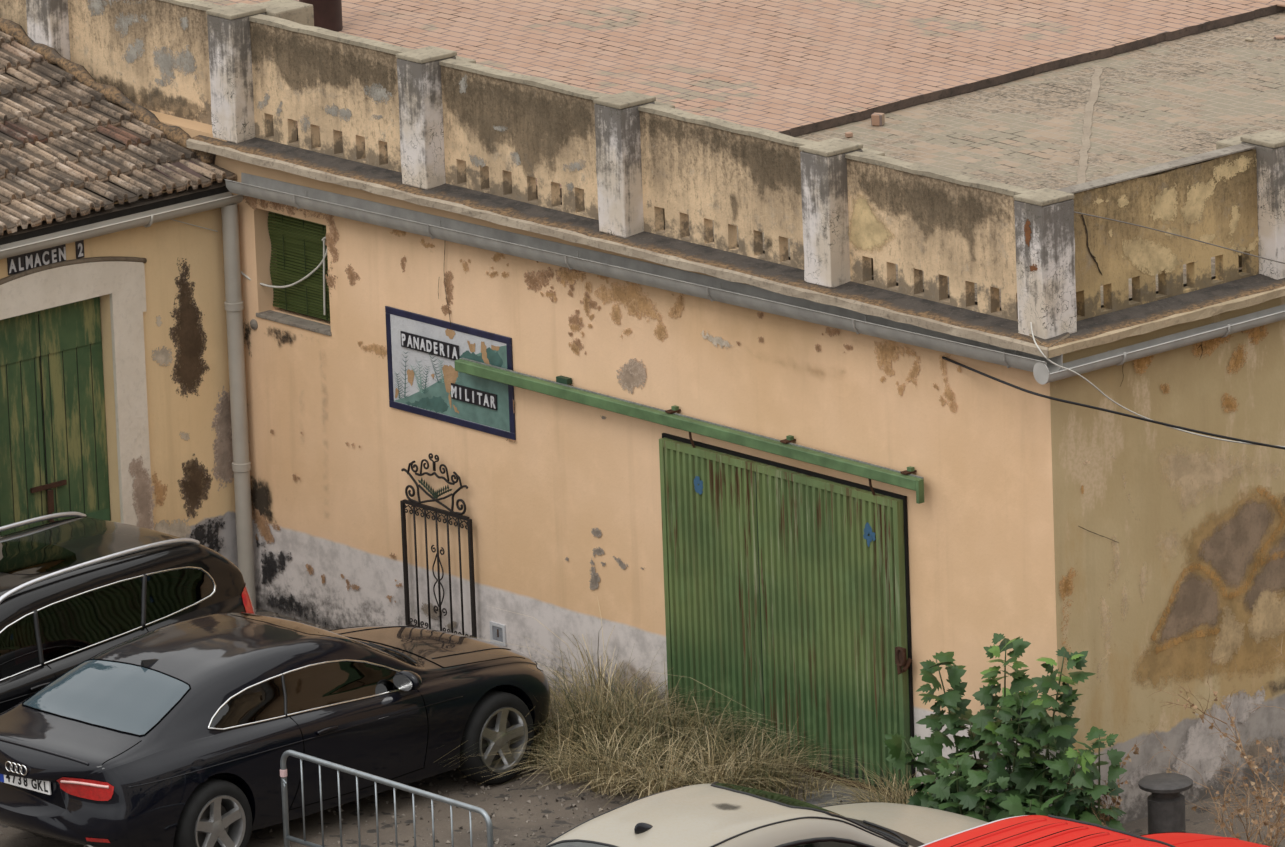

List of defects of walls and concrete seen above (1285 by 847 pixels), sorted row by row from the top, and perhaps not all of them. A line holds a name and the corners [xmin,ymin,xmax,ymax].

peeling [441,259,500,365]
peeling [486,252,684,356]
spalling [395,369,414,399]
spalling [431,365,459,413]
spalling [616,358,647,394]
peeling [874,340,920,396]
peeling [933,354,961,413]
peeling [128,454,191,538]
spalling [589,528,644,590]
peeling [1209,589,1285,666]